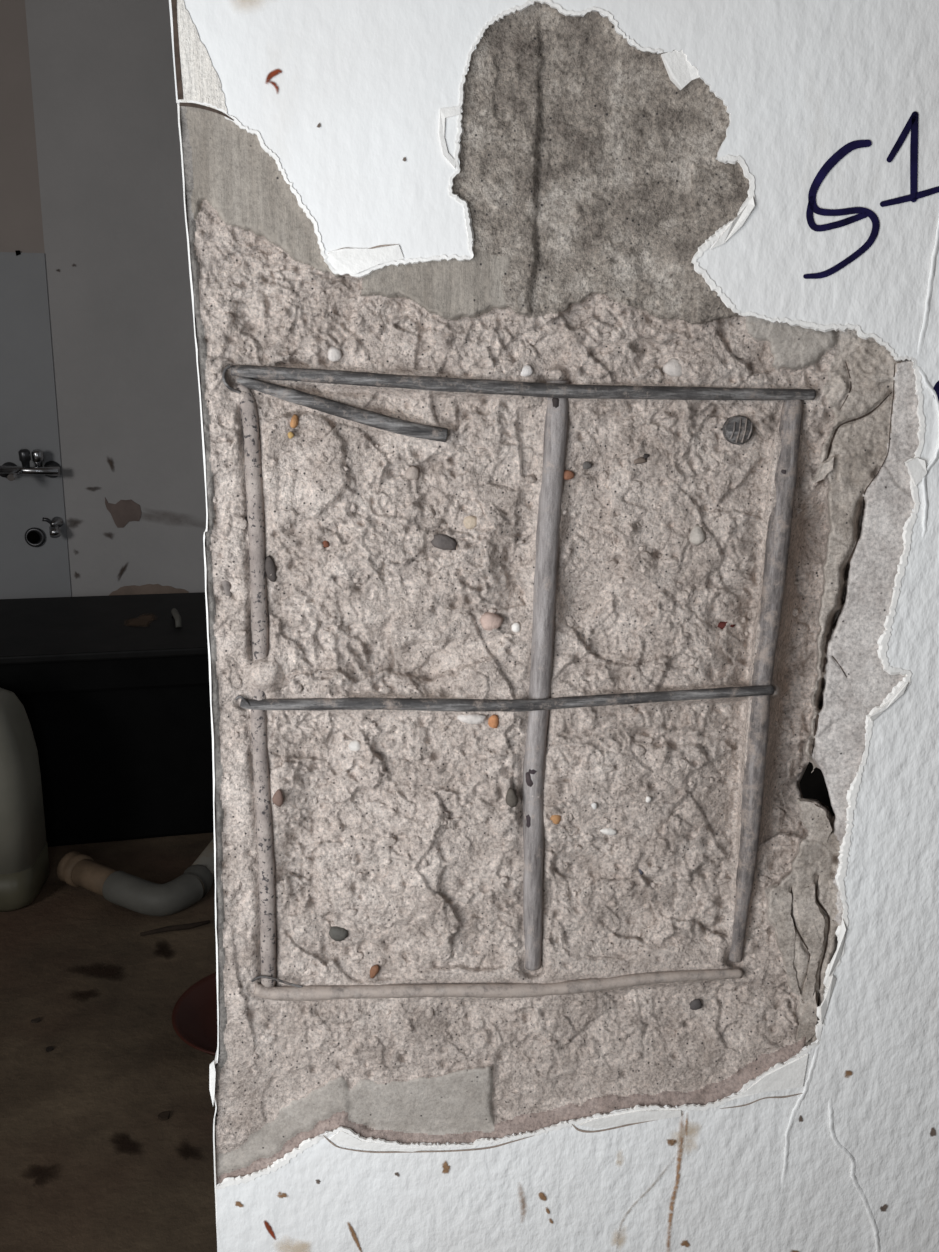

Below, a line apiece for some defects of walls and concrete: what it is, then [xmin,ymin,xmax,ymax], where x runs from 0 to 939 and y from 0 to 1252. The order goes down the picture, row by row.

spalling [176,0,927,1189]
crack [811,219,939,756]
crack [572,1119,688,1247]
crack [720,1038,881,1252]